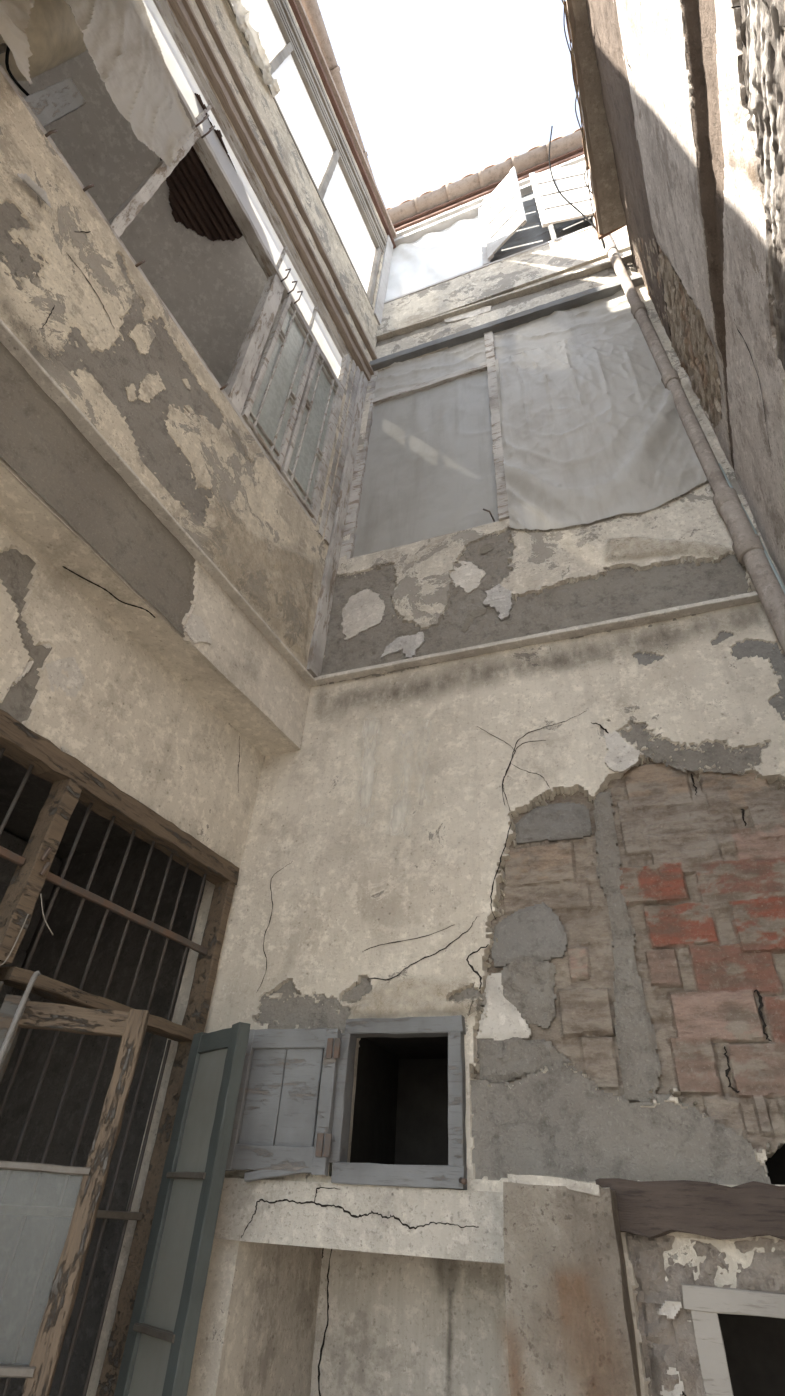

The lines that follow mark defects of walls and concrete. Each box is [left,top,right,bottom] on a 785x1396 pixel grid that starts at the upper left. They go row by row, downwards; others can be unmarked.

flaking render [0,201,49,290]
spalling [160,146,243,241]
flaking render [55,253,253,525]
flaking render [0,342,212,645]
flaking render [0,549,86,723]
crack [63,566,155,618]
flaking render [320,529,753,686]
flaking render [711,631,785,720]
crack [356,711,609,1014]
flaking render [449,722,785,1185]
crack [241,1187,479,1238]
crack [318,1248,332,1396]